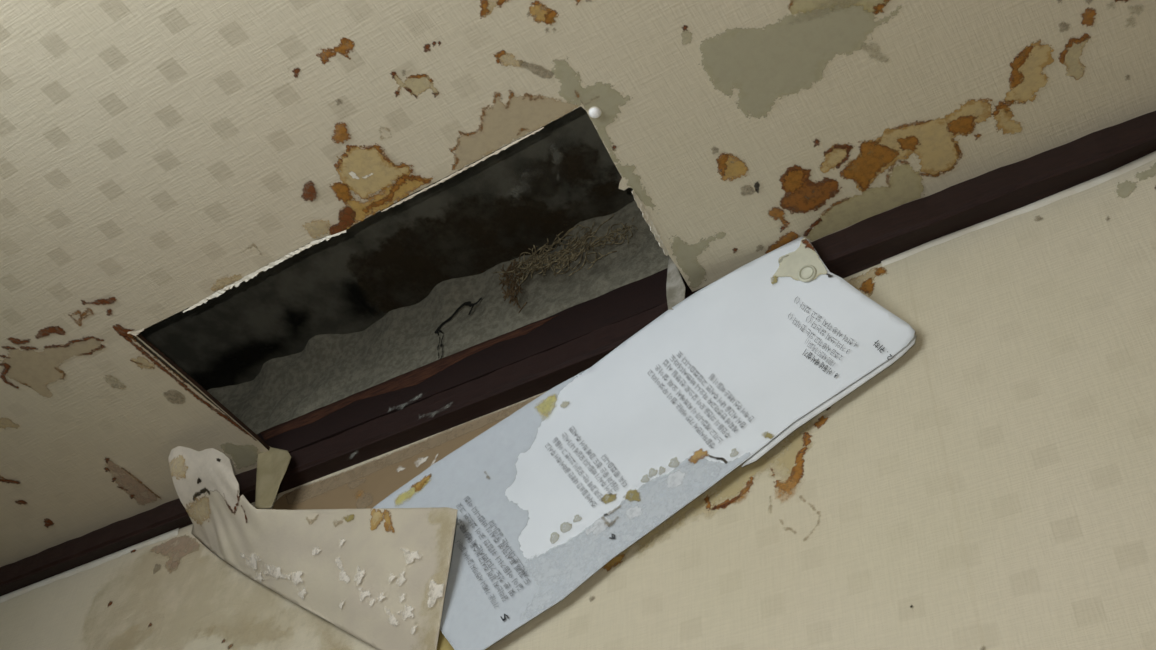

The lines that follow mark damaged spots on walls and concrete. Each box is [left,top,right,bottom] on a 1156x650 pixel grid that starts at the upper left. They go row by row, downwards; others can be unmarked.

water stain [329,143,433,235]
water stain [346,50,656,316]
water stain [211,275,241,291]
crack [434,297,482,359]
peeling [272,393,544,510]
water stain [619,422,810,555]
peeling [152,536,198,573]